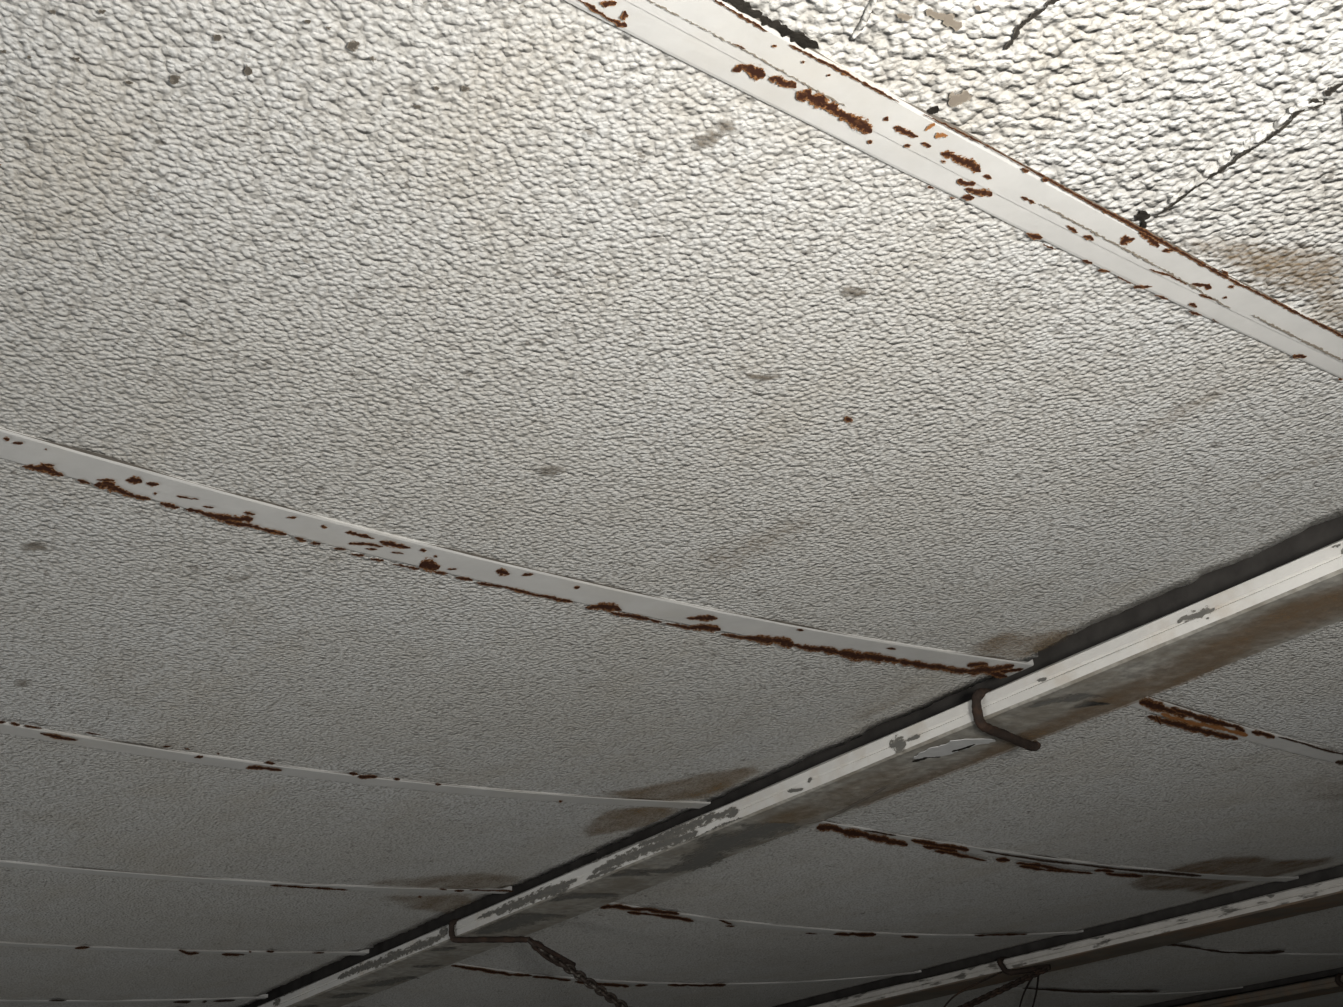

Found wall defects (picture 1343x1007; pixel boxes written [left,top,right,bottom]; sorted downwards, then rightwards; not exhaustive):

corrosion [578,0,629,28]
crack [648,0,845,106]
corrosion [715,0,899,102]
crack [1004,0,1060,50]
corrosion [732,43,1343,338]
crack [1156,83,1343,217]
crack [1040,204,1343,360]
corrosion [22,448,1023,679]
corrosion [0,721,100,741]
corrosion [245,761,282,771]
corrosion [1139,697,1343,765]
corrosion [817,823,1201,878]